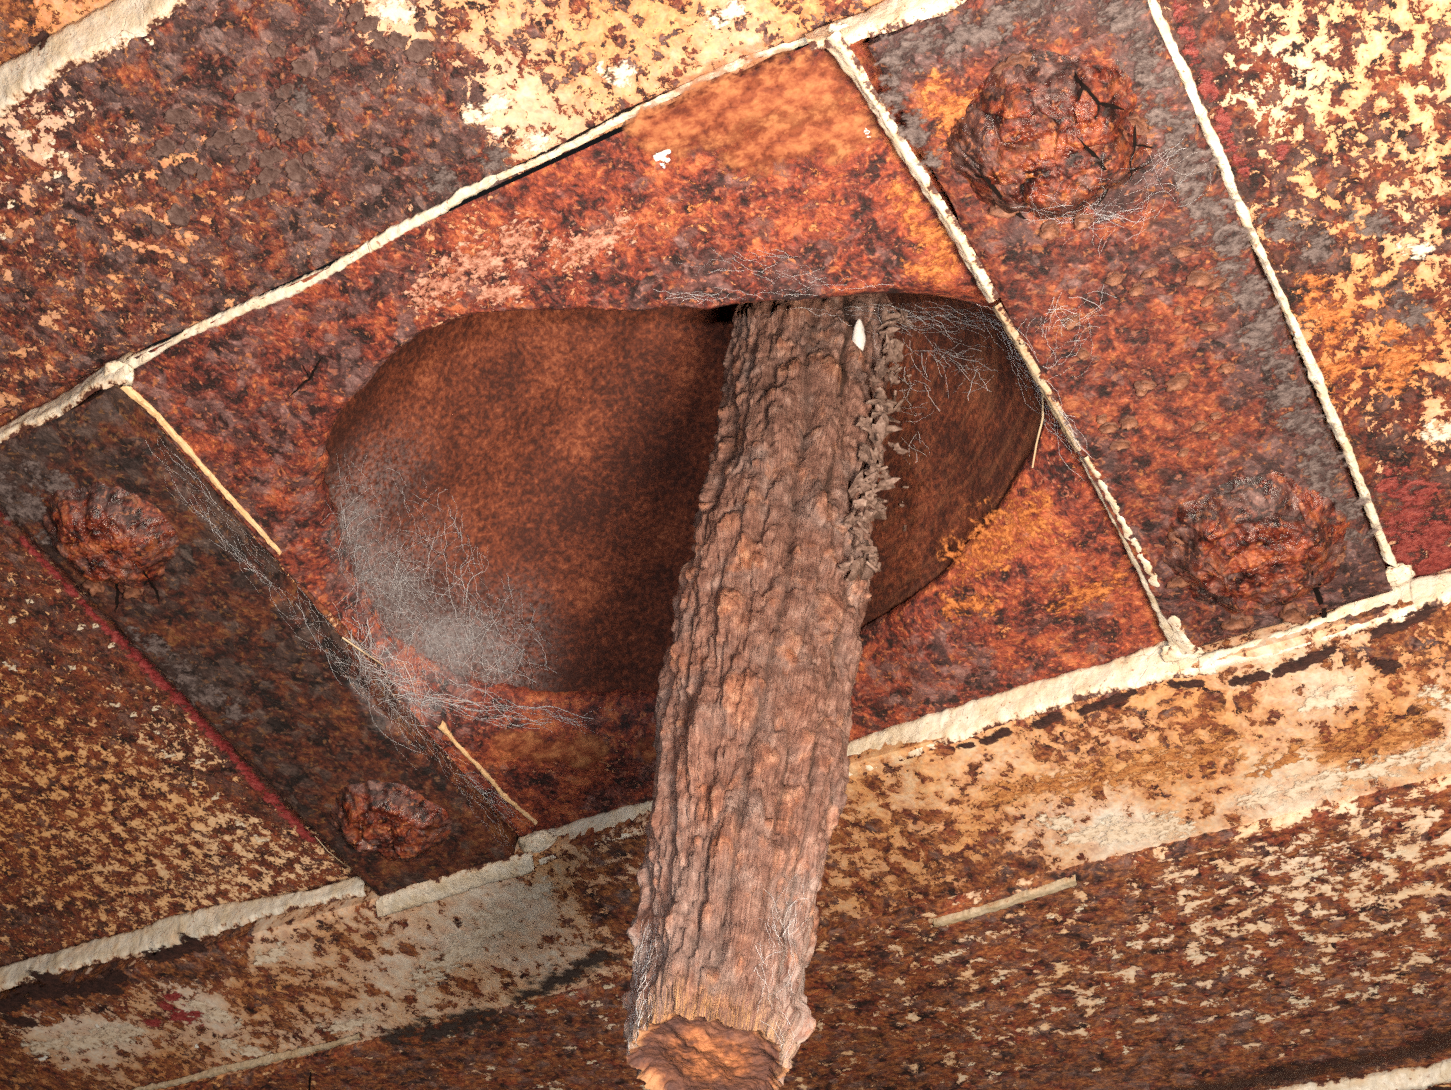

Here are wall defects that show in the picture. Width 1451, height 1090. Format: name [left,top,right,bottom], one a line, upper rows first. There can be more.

rust [346,0,436,77]
rust [145,27,348,235]
rust [625,45,879,174]
rust [913,68,977,154]
rust [402,206,637,313]
rust [882,179,965,284]
rust [1104,267,1159,297]
rust [1168,244,1235,332]
rust [1296,273,1421,396]
rust [838,307,913,581]
rust [937,485,1062,625]
rust [1047,564,1131,616]